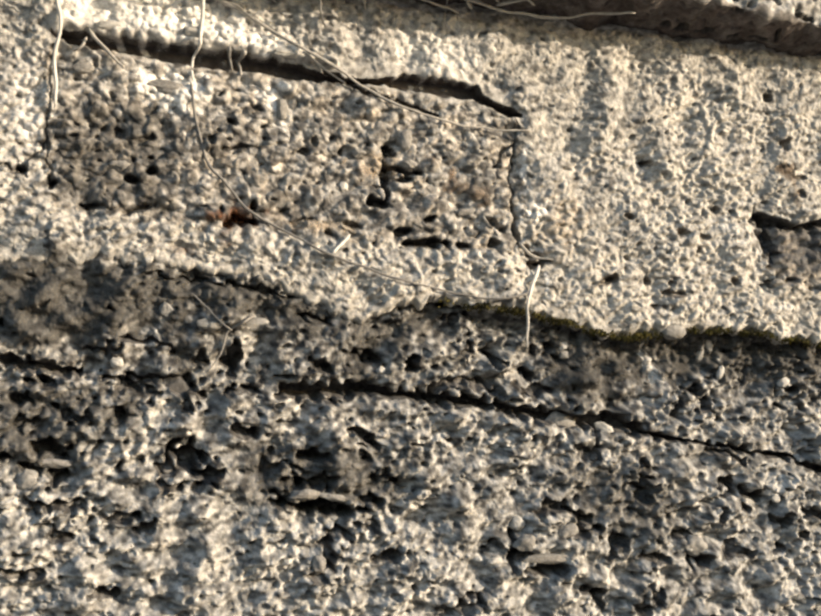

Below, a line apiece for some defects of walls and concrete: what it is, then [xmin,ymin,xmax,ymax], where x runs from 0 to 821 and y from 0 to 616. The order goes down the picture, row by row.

spalling [0,0,526,256]
crack [4,28,553,268]
crack [0,334,174,384]
spalling [164,339,259,415]
spalling [308,356,334,376]
spalling [346,426,382,463]
spalling [404,354,420,372]
spalling [461,340,553,398]
crack [273,376,821,475]
spalling [574,444,598,463]
leakage [529,325,821,414]
spalling [669,384,716,418]